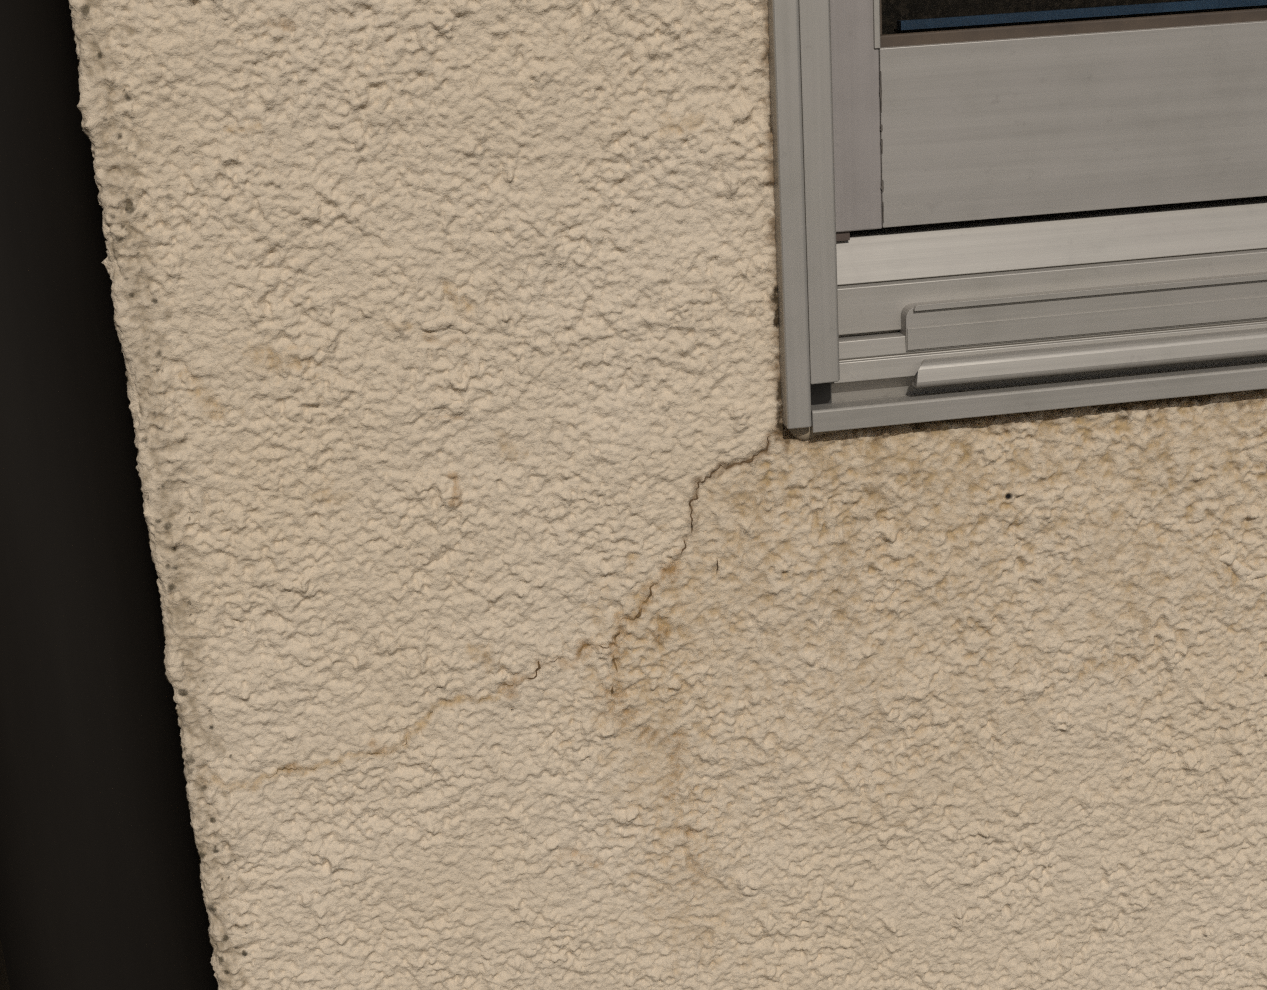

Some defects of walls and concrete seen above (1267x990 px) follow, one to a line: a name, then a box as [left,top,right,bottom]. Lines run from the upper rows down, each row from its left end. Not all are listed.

crack [366,431,776,754]